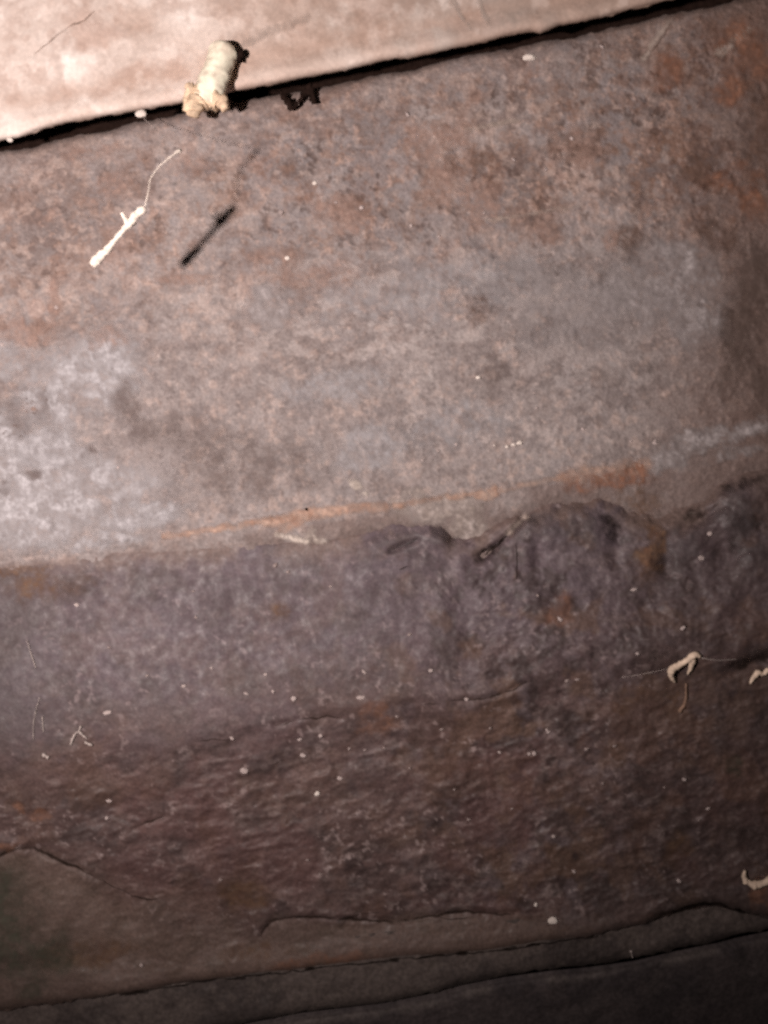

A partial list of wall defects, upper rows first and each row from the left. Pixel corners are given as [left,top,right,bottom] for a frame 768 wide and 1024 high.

corrosion [162,503,403,538]